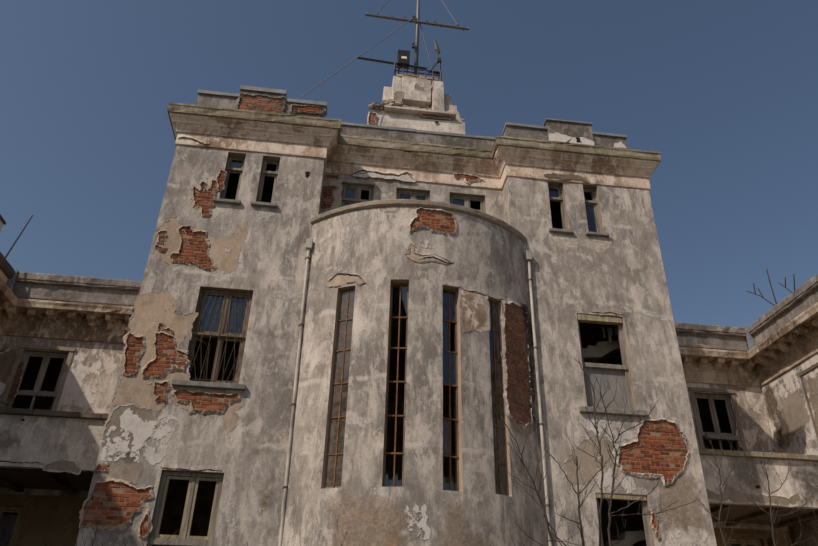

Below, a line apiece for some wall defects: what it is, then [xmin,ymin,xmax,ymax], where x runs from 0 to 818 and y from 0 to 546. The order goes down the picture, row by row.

peeling [321,173,343,212]
spalling [353,172,416,182]
peeling [156,216,248,275]
spalling [404,243,450,266]
spalling [325,272,366,287]
peeling [459,288,491,333]
peeling [59,354,102,408]
peeling [99,291,244,484]
spalling [43,459,81,475]